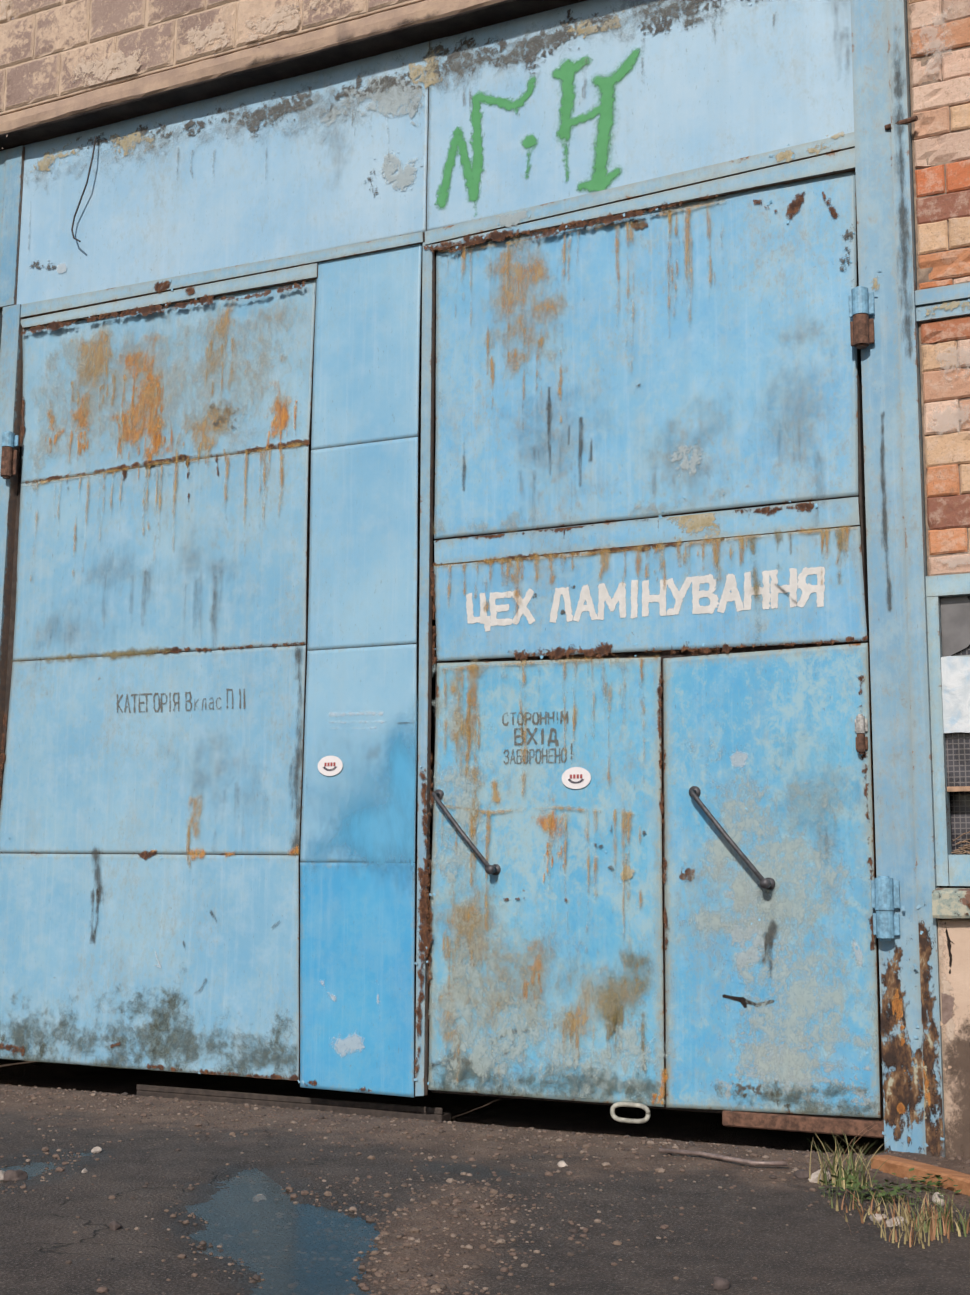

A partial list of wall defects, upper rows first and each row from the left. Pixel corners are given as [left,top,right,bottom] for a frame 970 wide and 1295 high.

peeling [30,0,770,173]
rust [423,194,718,305]
rust [839,224,855,287]
rust [21,279,313,509]
rust [775,527,851,551]
rust [430,501,818,884]
rust [413,756,488,1085]
rust [523,947,542,1001]
rust [562,953,649,1066]
rust [868,904,945,1157]
water stain [943,1020,970,1158]